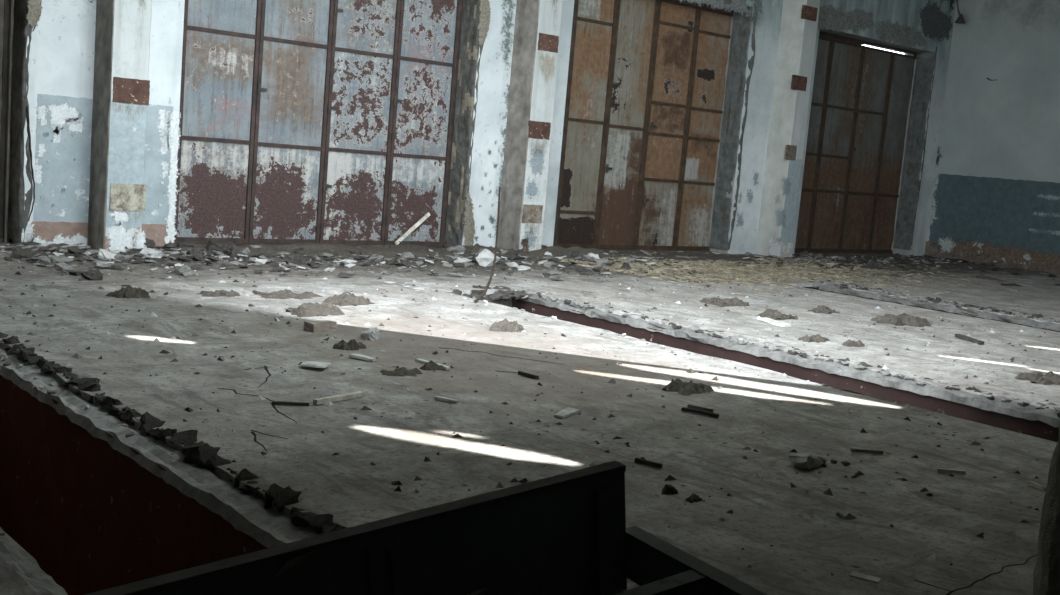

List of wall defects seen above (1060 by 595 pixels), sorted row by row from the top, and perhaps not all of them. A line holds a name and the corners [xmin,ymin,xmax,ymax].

spalling [7,0,85,246]
peeling [106,211,147,251]
peeling [157,107,181,244]
crack [914,554,1038,595]